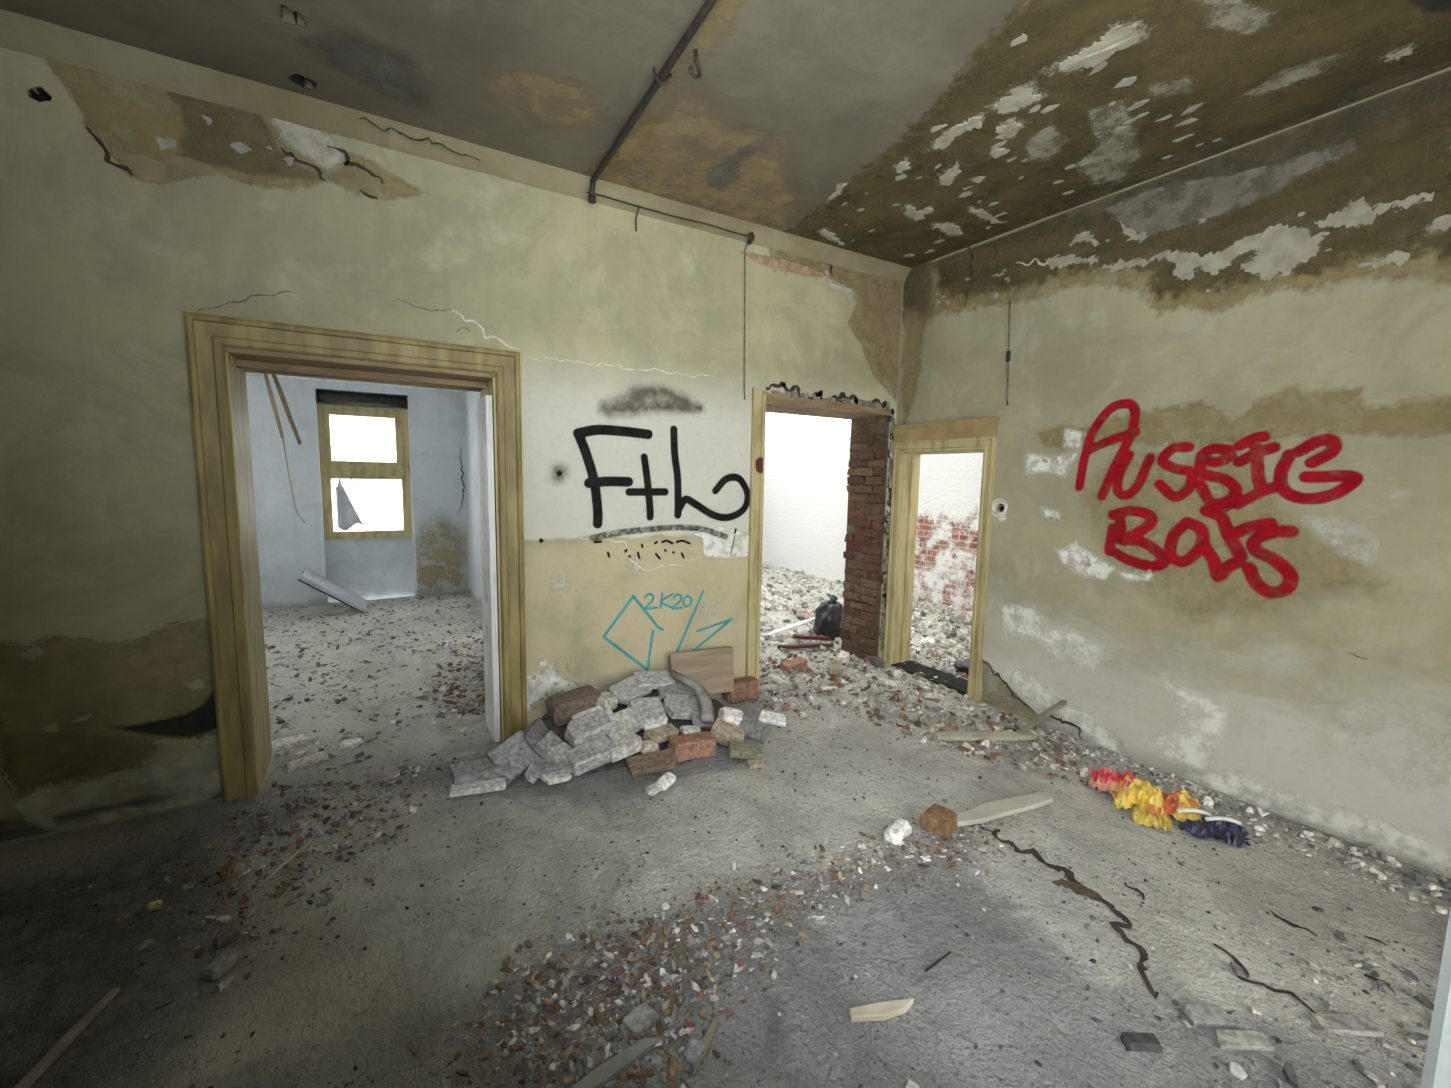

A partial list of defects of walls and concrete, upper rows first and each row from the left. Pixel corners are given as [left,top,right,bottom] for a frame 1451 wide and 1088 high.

spalling [287,74,317,89]
crack [359,117,480,161]
leakage [591,0,1451,424]
crack [197,291,295,311]
peeling [742,252,855,301]
crack [396,299,715,378]
peeling [539,526,749,571]
peeling [0,619,222,831]
crack [978,824,1159,999]